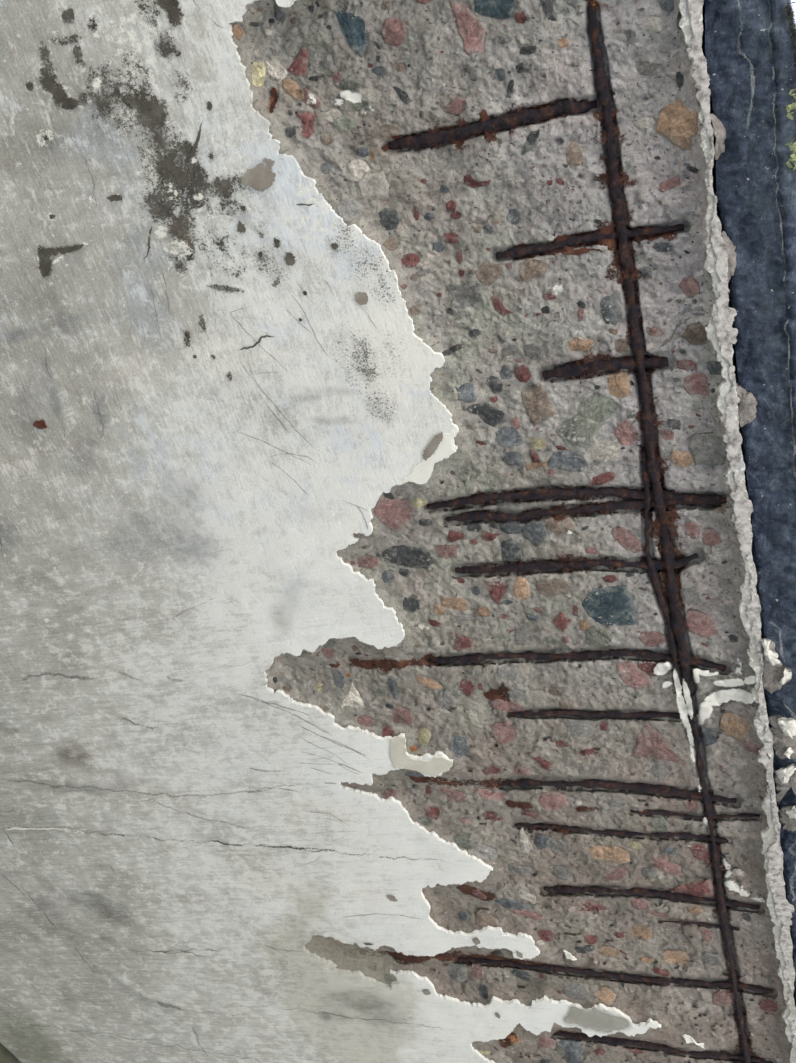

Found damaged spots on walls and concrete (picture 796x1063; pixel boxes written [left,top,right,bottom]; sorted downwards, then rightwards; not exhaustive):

leakage [37,0,296,293]
corrosion [381,98,577,151]
leakage [328,220,408,310]
leakage [183,314,206,359]
corrosion [455,74,688,612]
spalling [230,0,792,1063]
leakage [654,0,796,1004]
corrosion [329,654,445,672]
crack [3,778,449,863]
corrosion [409,776,514,789]
corrosion [359,949,548,970]
corrosion [499,1032,516,1048]